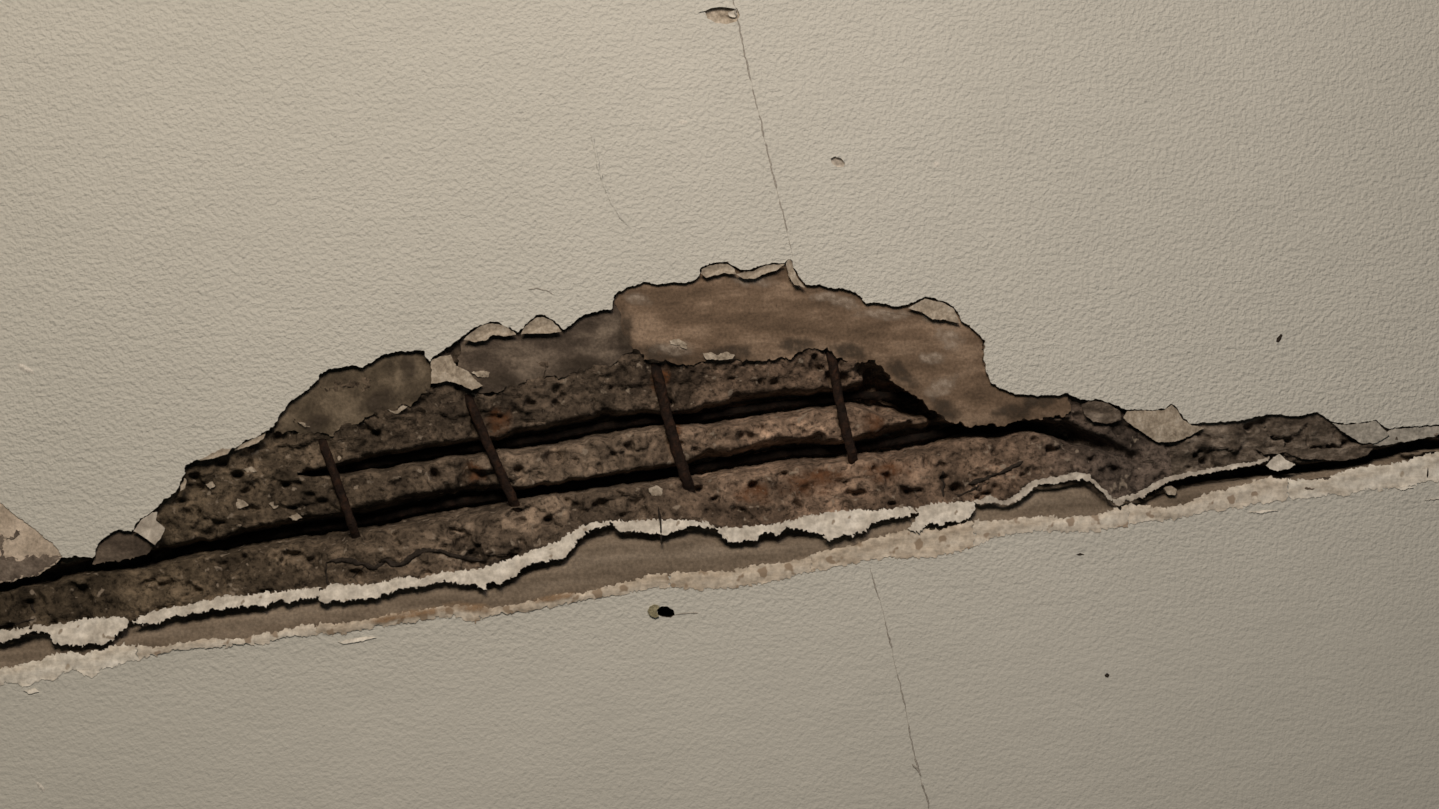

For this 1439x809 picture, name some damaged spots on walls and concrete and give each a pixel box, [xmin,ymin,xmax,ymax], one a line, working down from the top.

peeling [699,3,740,24]
crack [733,0,793,257]
spalling [0,259,1439,694]
crack [870,569,929,809]